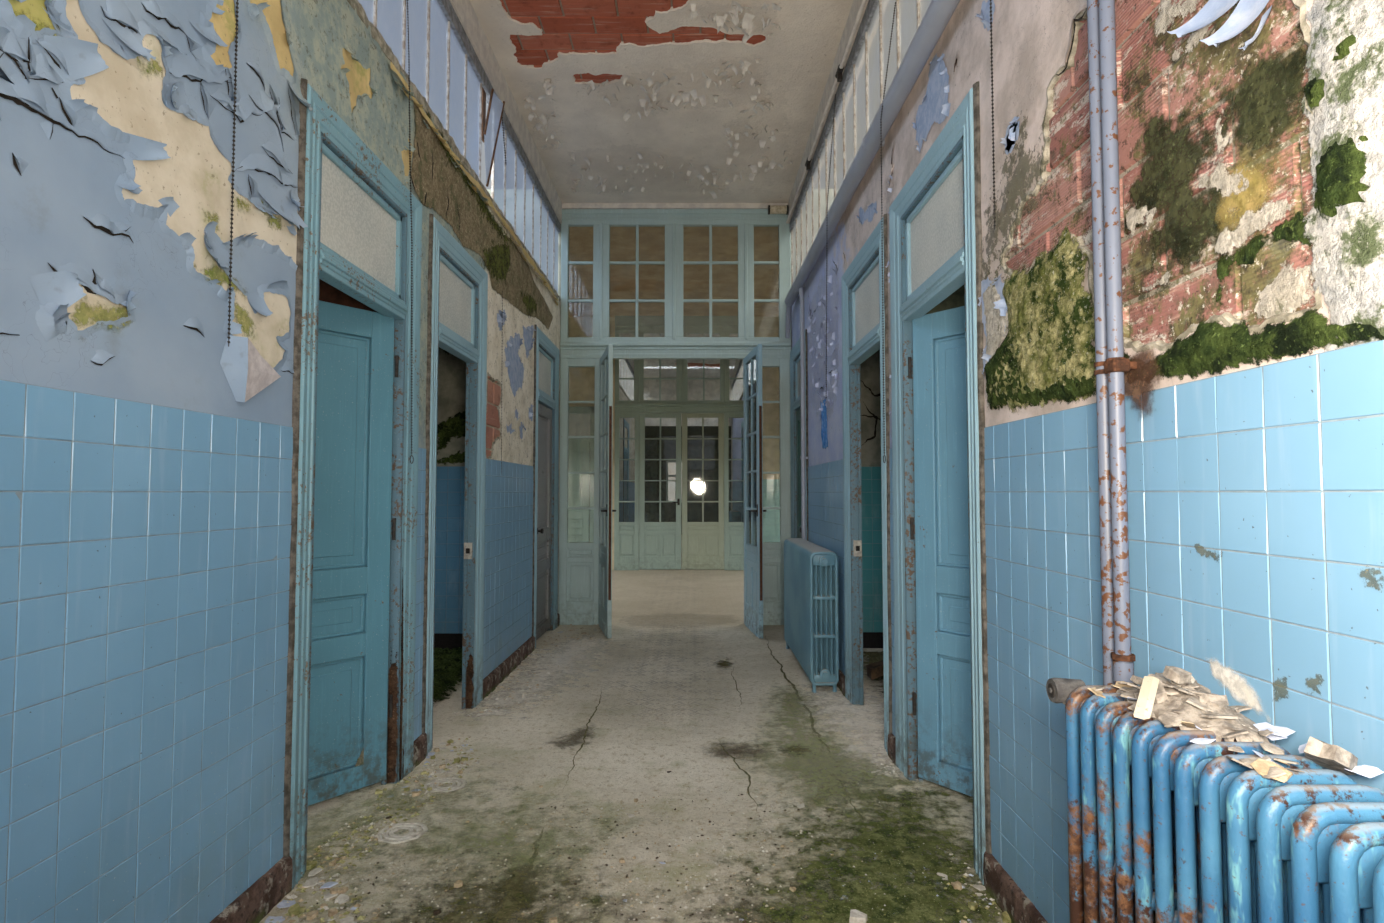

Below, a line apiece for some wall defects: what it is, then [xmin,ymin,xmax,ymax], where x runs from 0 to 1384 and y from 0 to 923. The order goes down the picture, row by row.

peeling [0,0,318,402]
spalling [496,0,793,199]
peeling [913,53,951,153]
peeling [976,0,995,31]
spalling [978,8,1094,375]
spalling [1115,0,1322,353]
water stain [1216,162,1276,228]
water stain [1301,0,1384,352]
spalling [486,309,536,459]
crack [563,692,602,789]
crack [764,635,862,816]